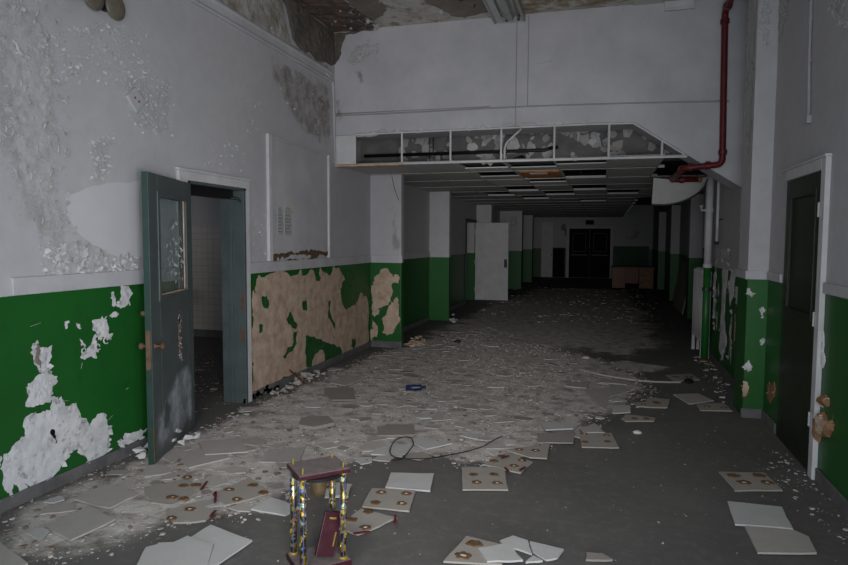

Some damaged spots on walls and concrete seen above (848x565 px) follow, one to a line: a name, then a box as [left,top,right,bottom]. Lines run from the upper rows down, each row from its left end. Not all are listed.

flaking render [218,0,386,68]
flaking render [424,0,488,19]
peeling [520,0,628,14]
peeling [356,129,449,162]
peeling [464,119,633,166]
peeling [80,286,133,360]
peeling [251,265,400,394]
peeling [712,262,755,362]
peeling [0,340,147,497]